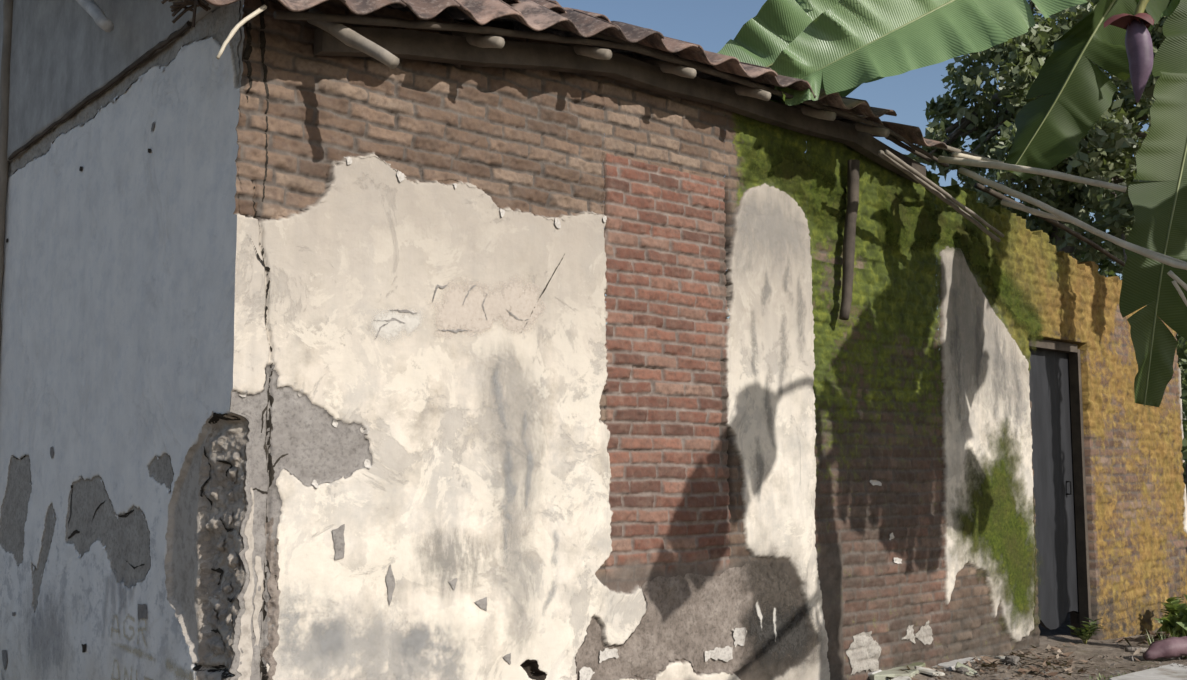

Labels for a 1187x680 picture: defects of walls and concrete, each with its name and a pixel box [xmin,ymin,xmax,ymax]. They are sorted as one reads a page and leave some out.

flaking render [372,309,421,340]
crack [250,183,288,680]
spalling [0,364,373,680]
spalling [503,653,547,680]
spalling [575,563,766,680]